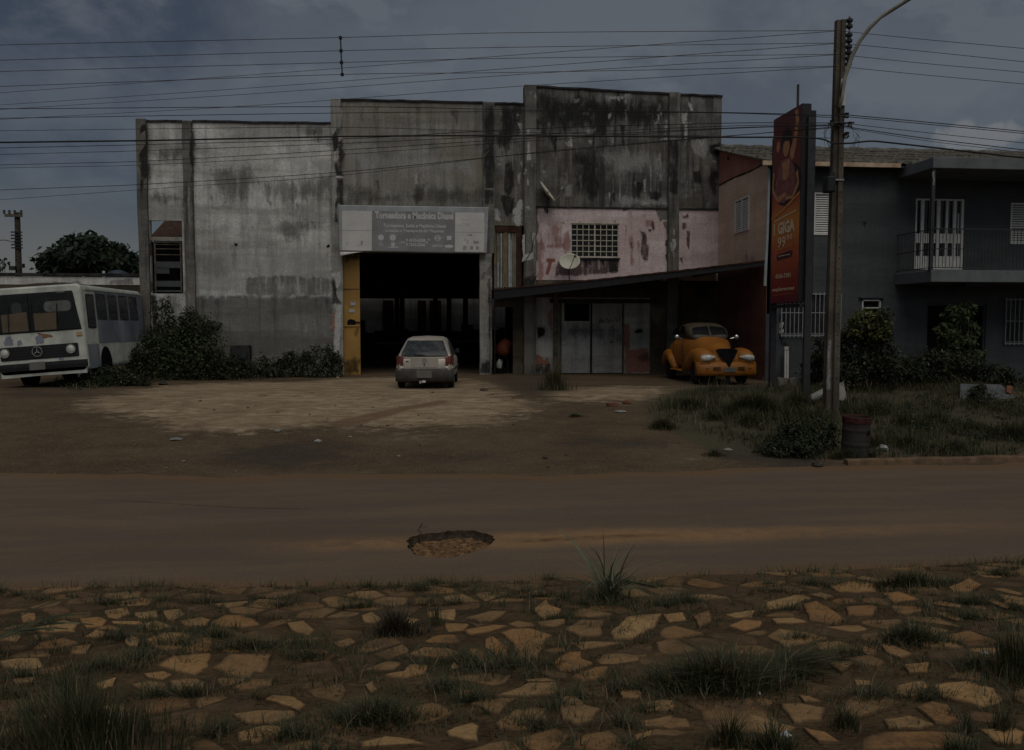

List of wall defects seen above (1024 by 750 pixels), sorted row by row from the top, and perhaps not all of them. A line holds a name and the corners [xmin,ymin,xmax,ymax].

water stain [139,124,151,193]
water stain [484,93,693,226]
water stain [316,275,341,304]